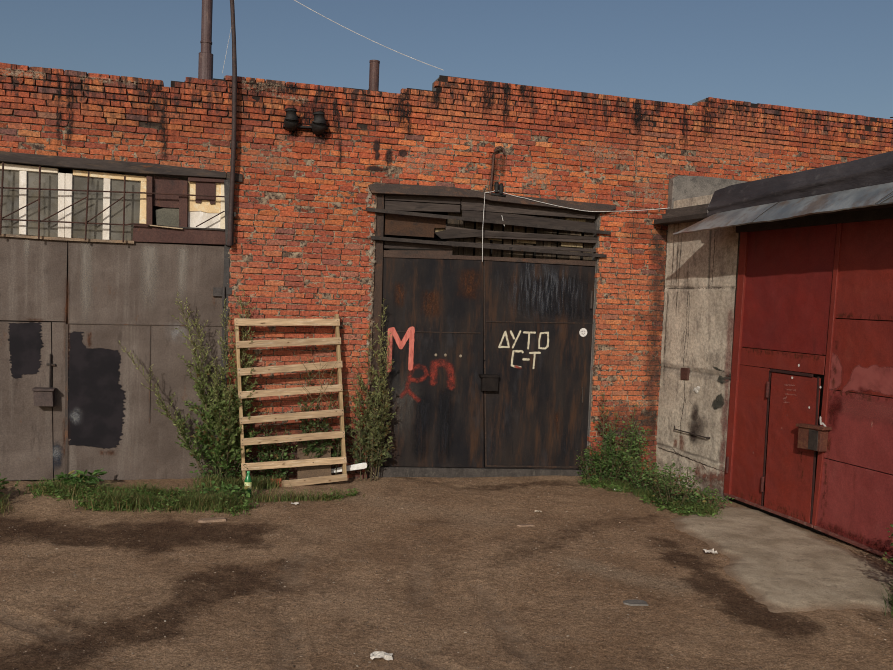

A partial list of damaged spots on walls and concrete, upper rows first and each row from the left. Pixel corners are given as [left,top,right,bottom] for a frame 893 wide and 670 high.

damp [243,81,305,101]
damp [503,84,530,120]
peeling [820,353,893,395]